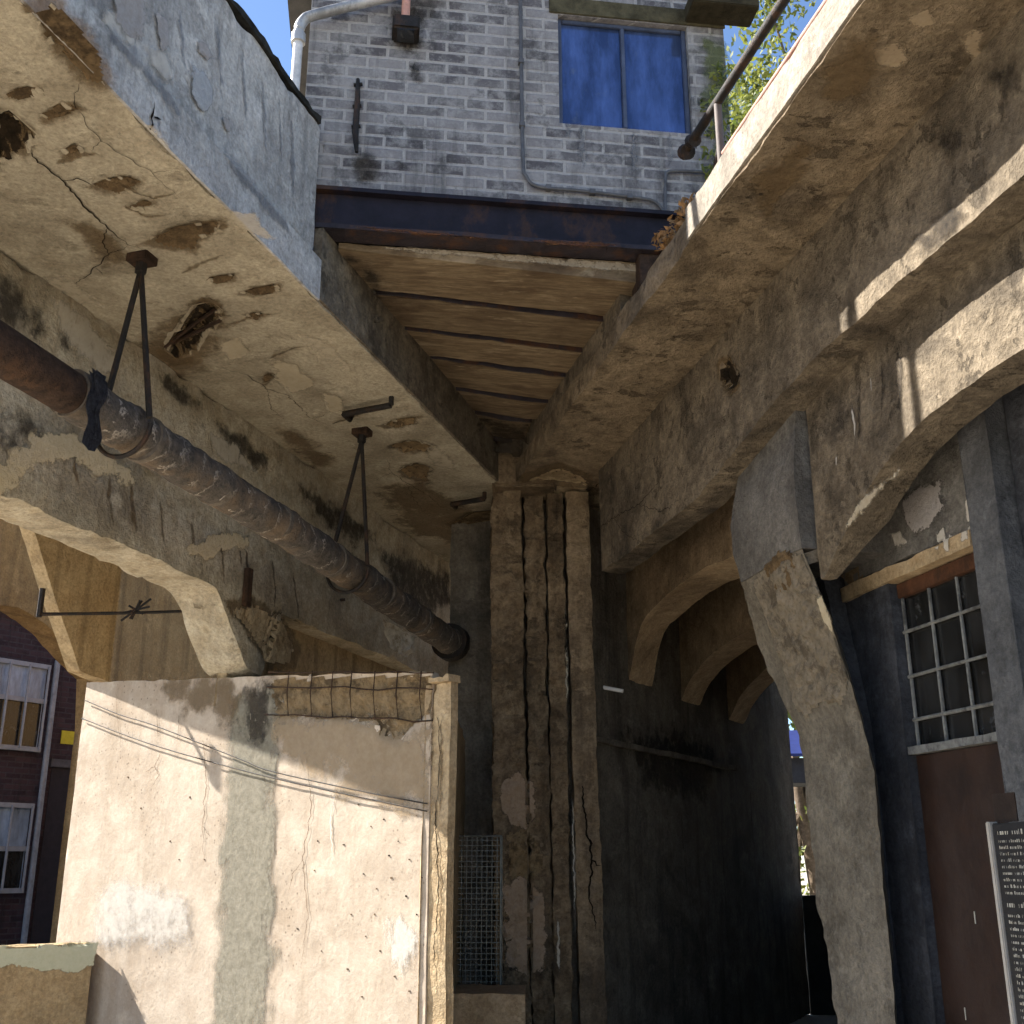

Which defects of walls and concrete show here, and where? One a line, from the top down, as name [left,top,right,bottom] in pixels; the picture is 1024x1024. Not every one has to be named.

spalling [0,85,85,165]
crack [24,141,142,283]
spalling [91,176,140,194]
crack [74,88,180,198]
spalling [144,221,227,254]
spalling [163,298,222,361]
peeling [892,478,944,545]
spalling [224,597,436,738]
spalling [754,549,849,718]
leakage [163,674,443,1024]
peeling [500,771,536,830]
crack [581,786,601,929]